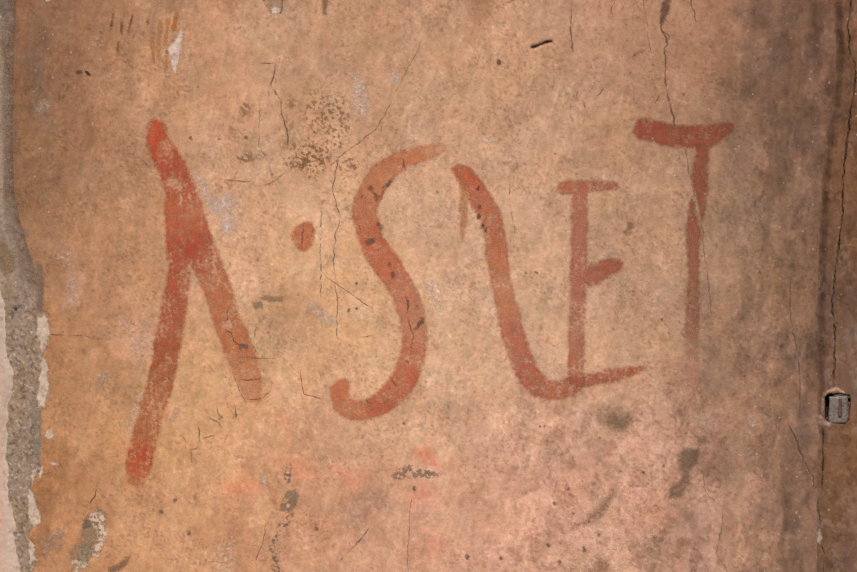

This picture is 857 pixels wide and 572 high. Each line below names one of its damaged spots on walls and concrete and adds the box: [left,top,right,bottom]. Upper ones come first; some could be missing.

spalling [263,0,283,14]
crack [264,63,289,144]
crack [647,28,675,124]
crack [228,105,390,336]
crack [831,2,857,375]
spalling [41,511,109,572]